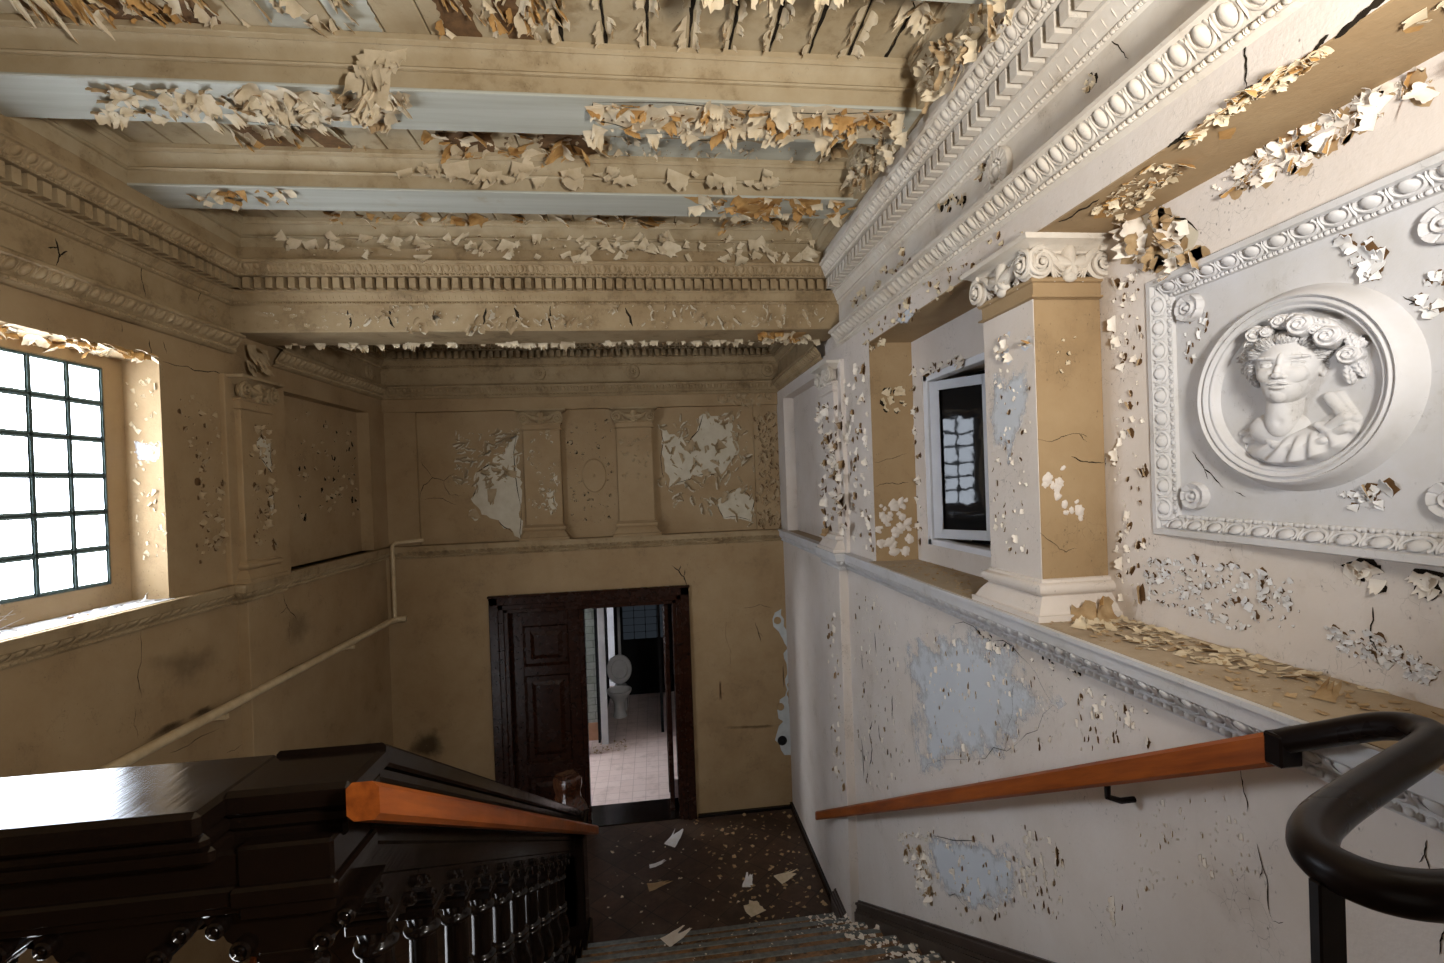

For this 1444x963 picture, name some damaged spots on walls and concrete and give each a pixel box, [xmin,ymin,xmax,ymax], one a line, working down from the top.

peeling [9,0,221,42]
peeling [432,0,570,44]
peeling [635,0,661,49]
crack [1311,0,1385,56]
peeling [85,48,909,266]
peeling [1212,67,1440,200]
peeling [1331,233,1390,284]
peeling [814,230,1023,552]
peeling [1091,46,1335,631]
peeling [452,427,560,538]
peeling [658,410,782,529]
peeling [826,592,1151,797]